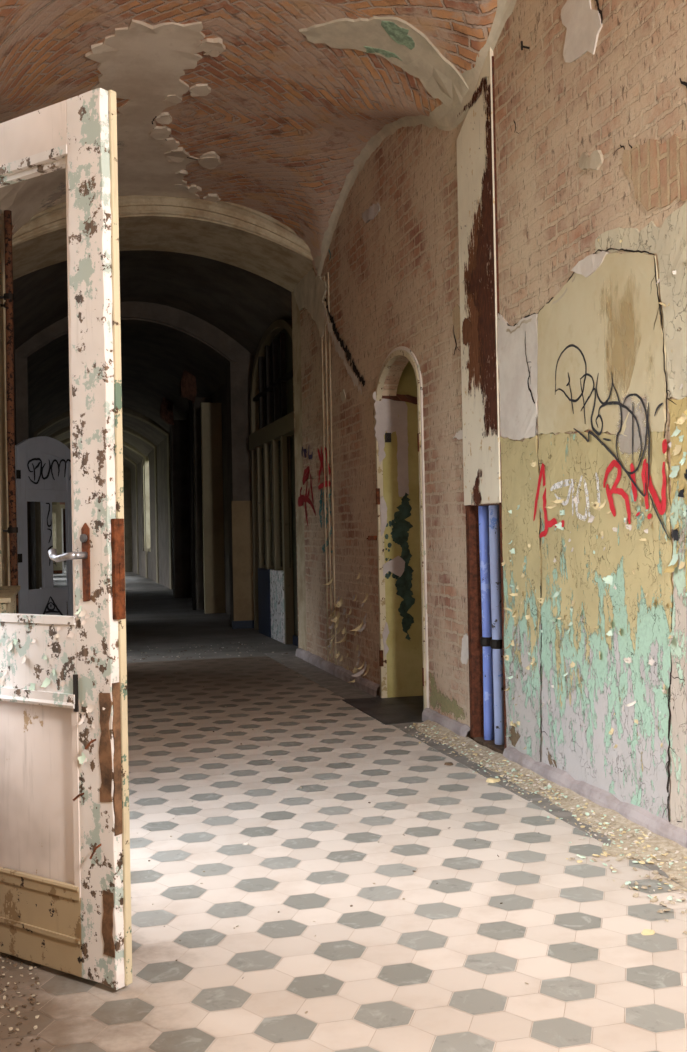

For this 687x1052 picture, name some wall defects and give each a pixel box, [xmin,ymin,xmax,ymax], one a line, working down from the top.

flaking render [0,168,66,236]
flaking render [85,19,226,203]
flaking render [299,16,469,107]
peeling [497,201,687,830]